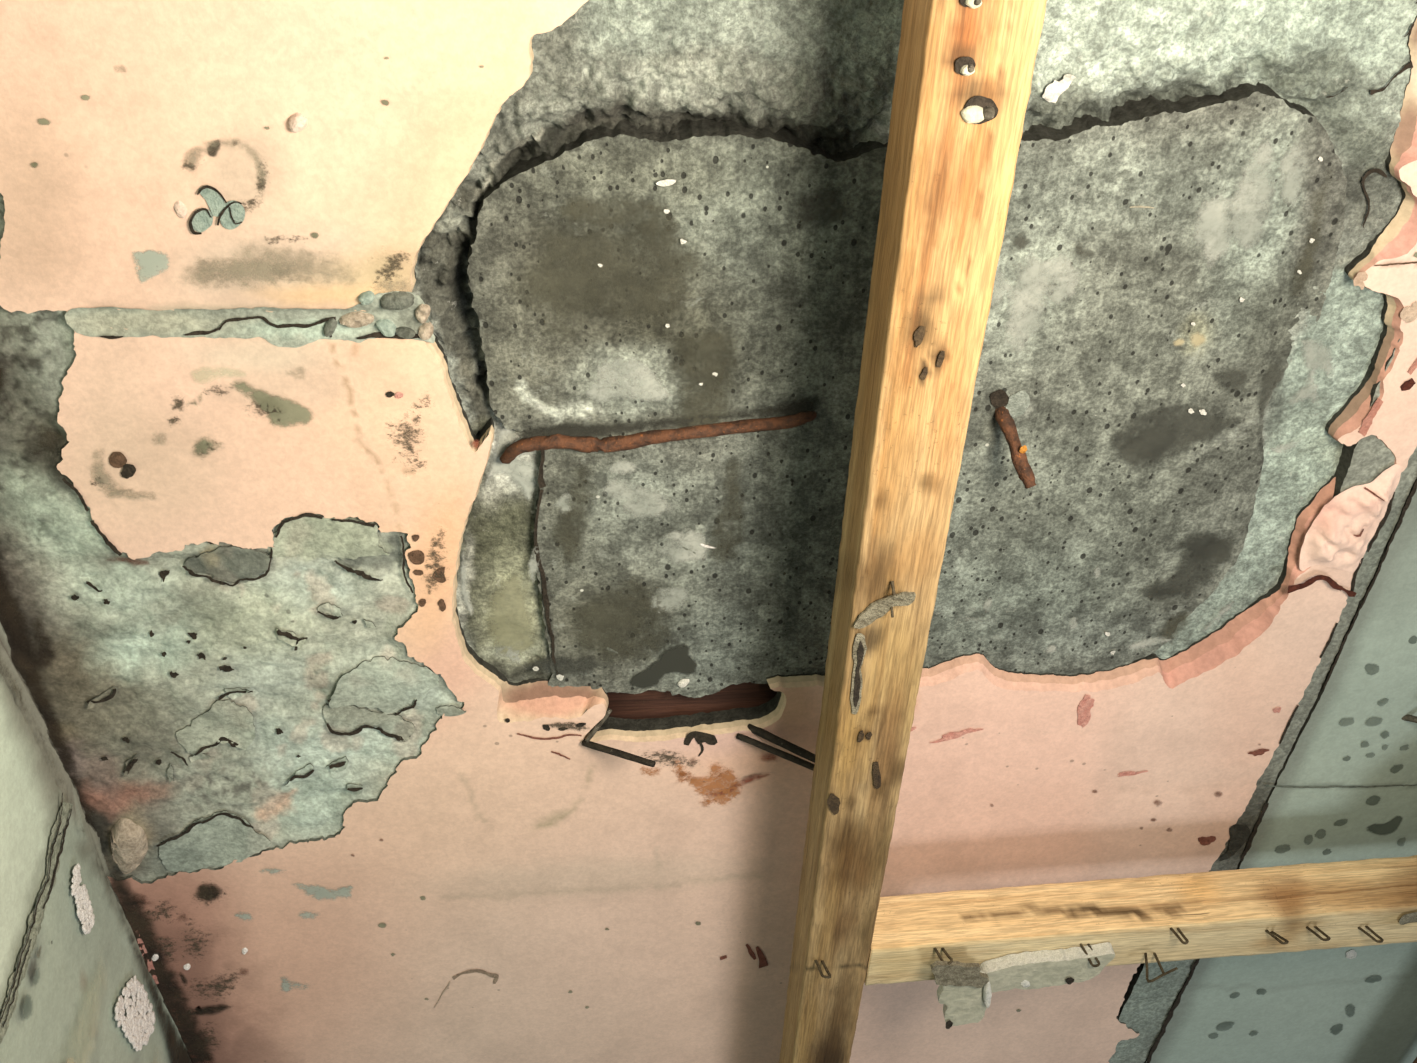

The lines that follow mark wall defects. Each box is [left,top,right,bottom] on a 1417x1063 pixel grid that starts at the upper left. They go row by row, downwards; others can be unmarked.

peeling [189,185,245,235]
spalling [410,0,904,756]
leakage [587,333,734,427]
spalling [919,0,1417,727]
corrosion [500,411,817,464]
corrosion [990,389,1036,489]
leakage [1114,405,1237,464]
crack [534,450,559,674]
peeling [0,306,466,1044]
corrosion [643,751,775,806]
leakage [71,863,95,935]
leakage [112,871,238,1063]